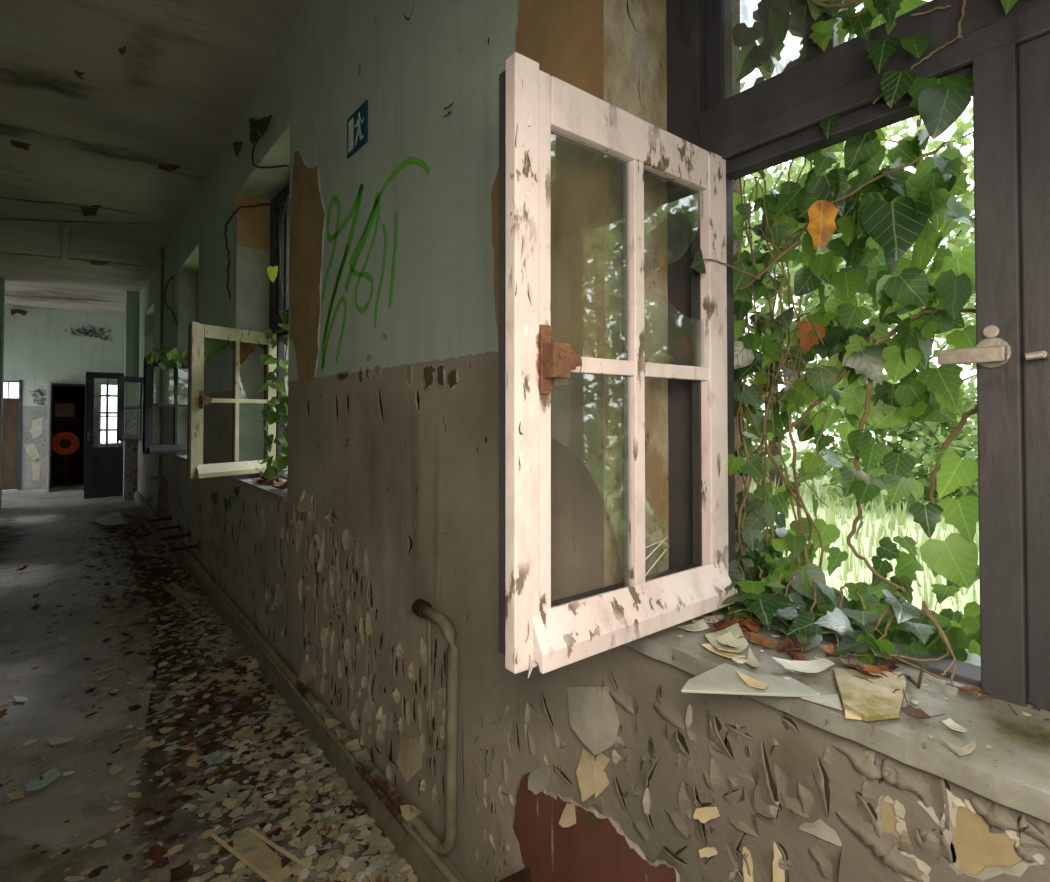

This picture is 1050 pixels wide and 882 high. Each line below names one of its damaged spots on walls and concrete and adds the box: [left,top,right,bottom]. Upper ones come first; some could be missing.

peeling [237,193,270,253]
peeling [289,149,326,381]
peeling [644,171,668,364]
rust [537,335,555,410]
peeling [605,375,623,587]
peeling [645,377,669,576]
peeling [186,635,261,767]
peeling [278,490,446,821]
peeling [476,678,680,882]
peeling [686,807,720,834]
peeling [699,847,717,865]